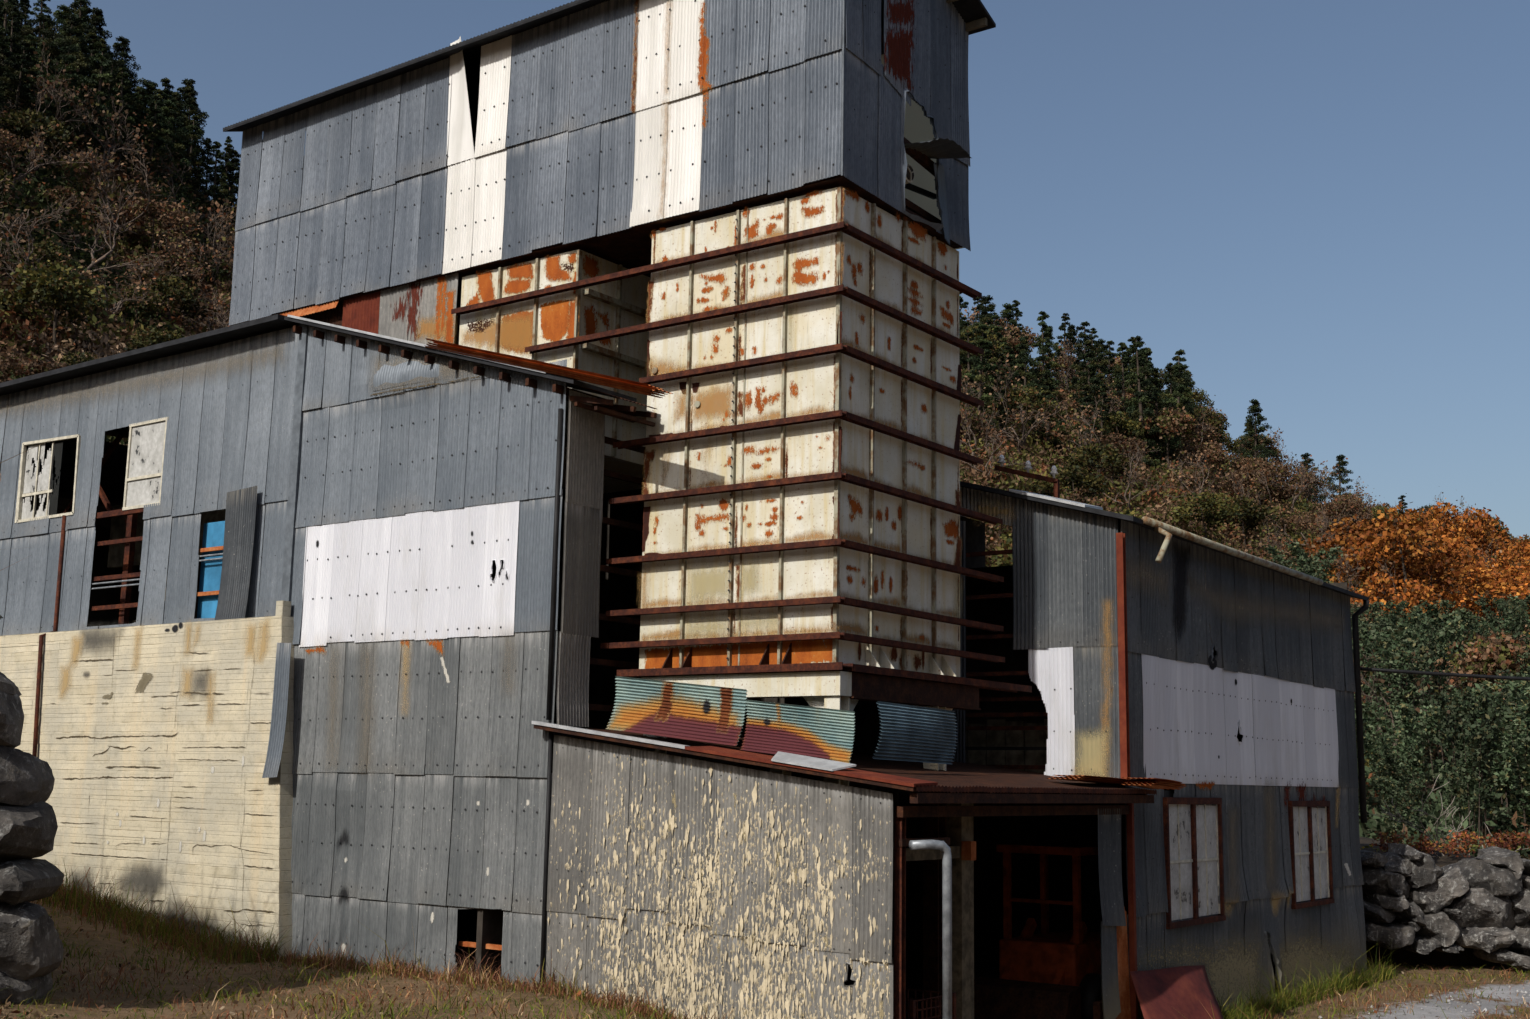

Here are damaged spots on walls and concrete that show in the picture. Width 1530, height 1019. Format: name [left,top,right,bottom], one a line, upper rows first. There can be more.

corrosion [697,3,711,128]
corrosion [390,252,611,354]
corrosion [609,188,1009,763]
water stain [84,631,115,648]